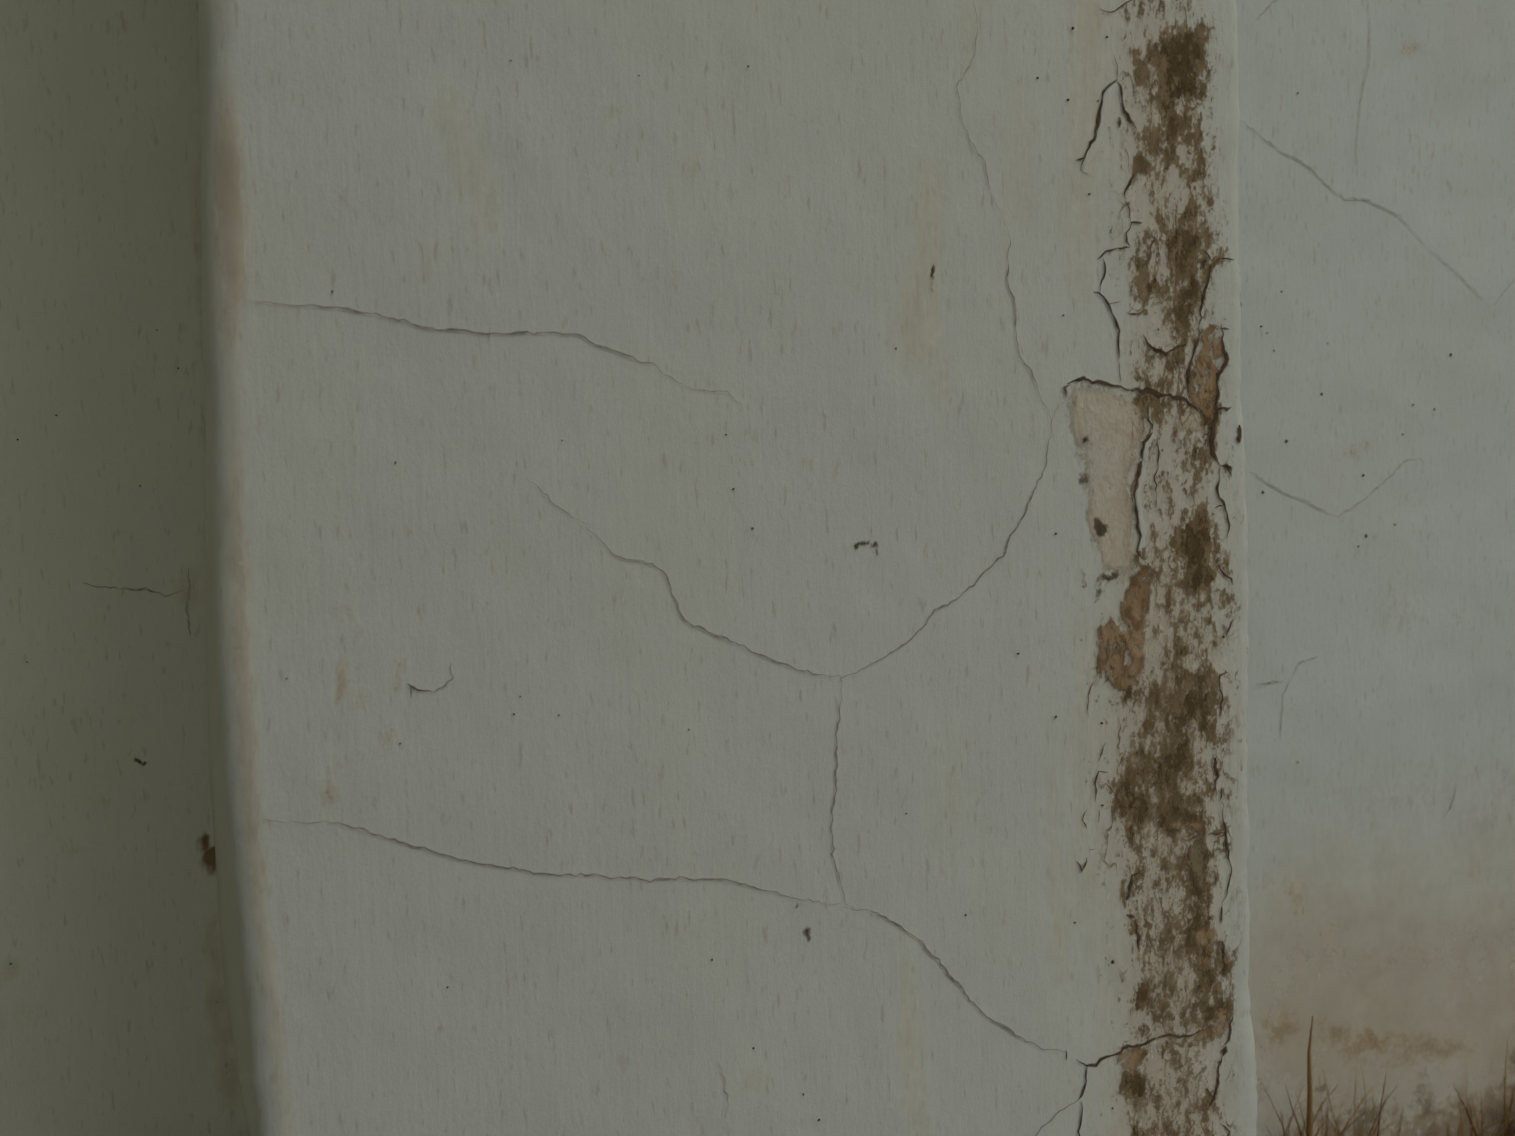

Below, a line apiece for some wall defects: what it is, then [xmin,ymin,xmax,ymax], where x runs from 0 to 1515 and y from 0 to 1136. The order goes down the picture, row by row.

peeling [1174,324,1223,434]
crack [84,570,191,631]
crack [244,6,1423,1136]
peeling [1068,384,1153,691]
corrosion [201,834,216,872]